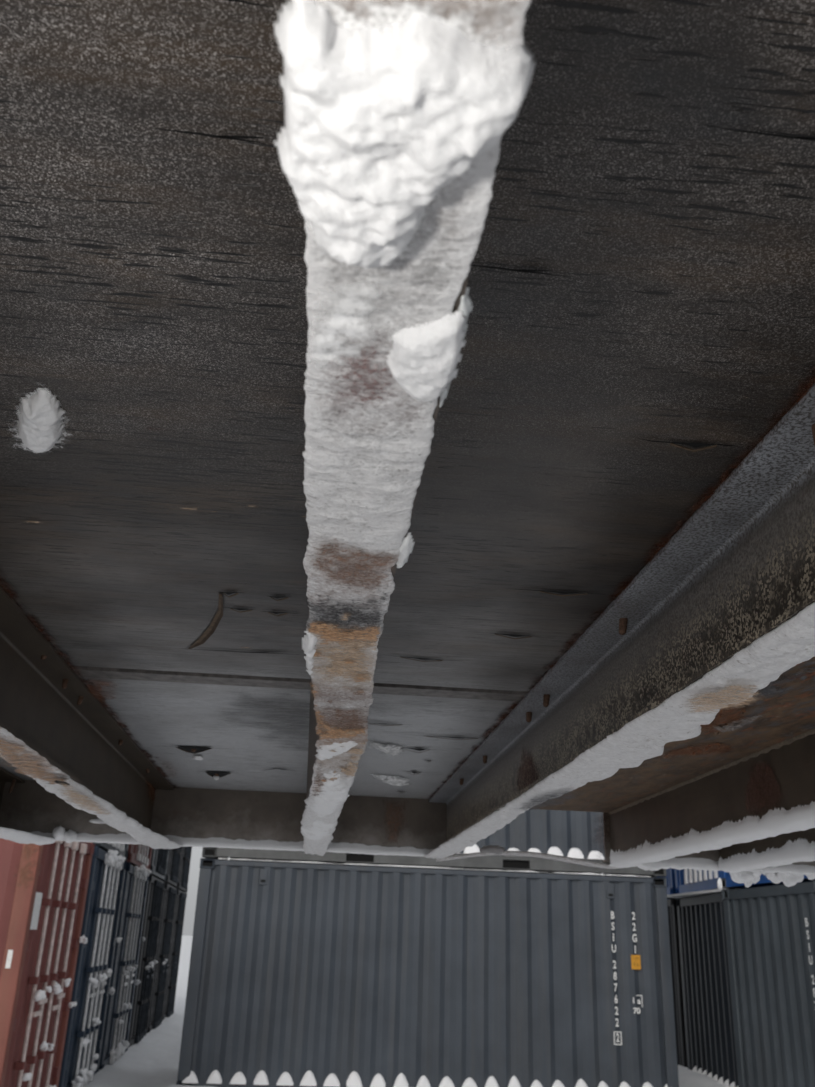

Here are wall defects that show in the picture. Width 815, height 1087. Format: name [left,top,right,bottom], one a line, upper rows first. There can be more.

corrosion [644,371,815,562]
corrosion [312,543,394,590]
corrosion [0,578,178,788]
corrosion [310,683,366,796]
corrosion [308,614,380,695]
corrosion [429,579,634,799]
corrosion [689,685,759,733]